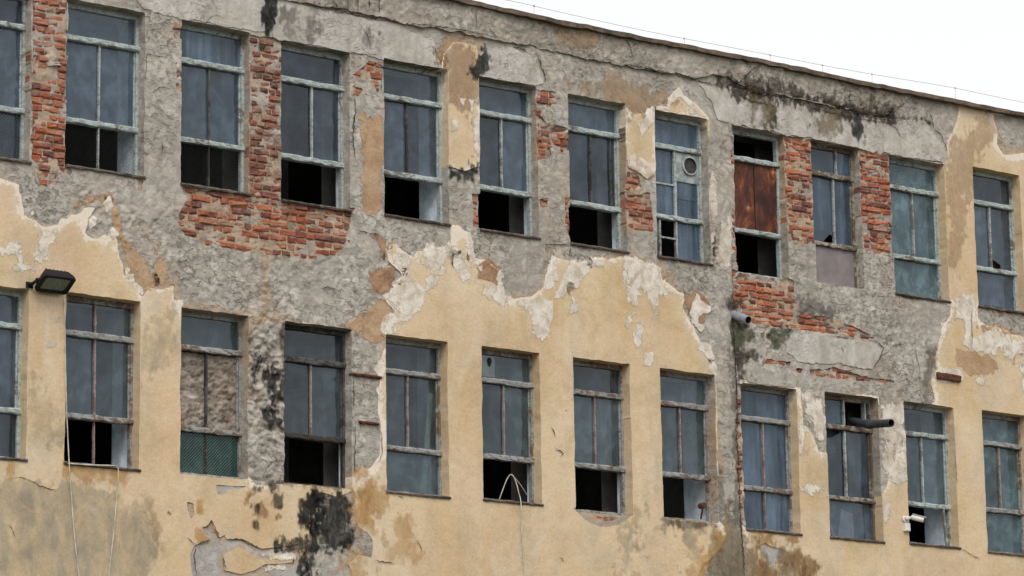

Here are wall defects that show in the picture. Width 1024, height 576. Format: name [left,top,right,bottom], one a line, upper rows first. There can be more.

crack [623,40,768,104]
damp [716,70,931,141]
crack [804,93,902,137]
peeling [0,0,959,488]
peeling [683,212,1024,576]
spalling [190,488,373,576]
damp [274,486,355,576]